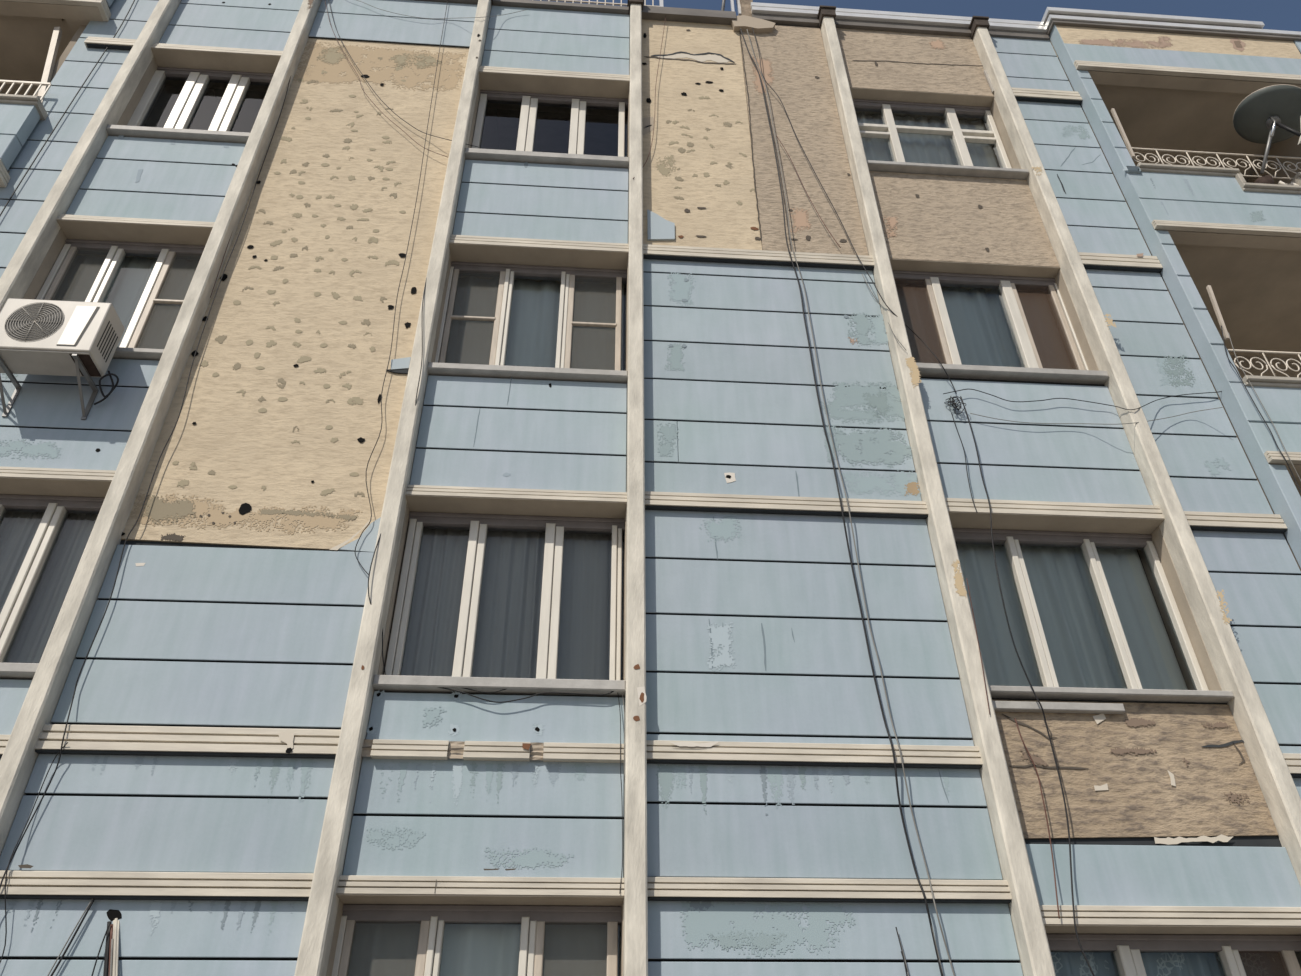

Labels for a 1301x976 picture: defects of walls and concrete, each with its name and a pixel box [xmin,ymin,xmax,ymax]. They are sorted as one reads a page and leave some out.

flaking render [121,34,481,551]
flaking render [642,19,994,256]
flaking render [869,171,1060,267]
flaking render [992,700,1278,845]